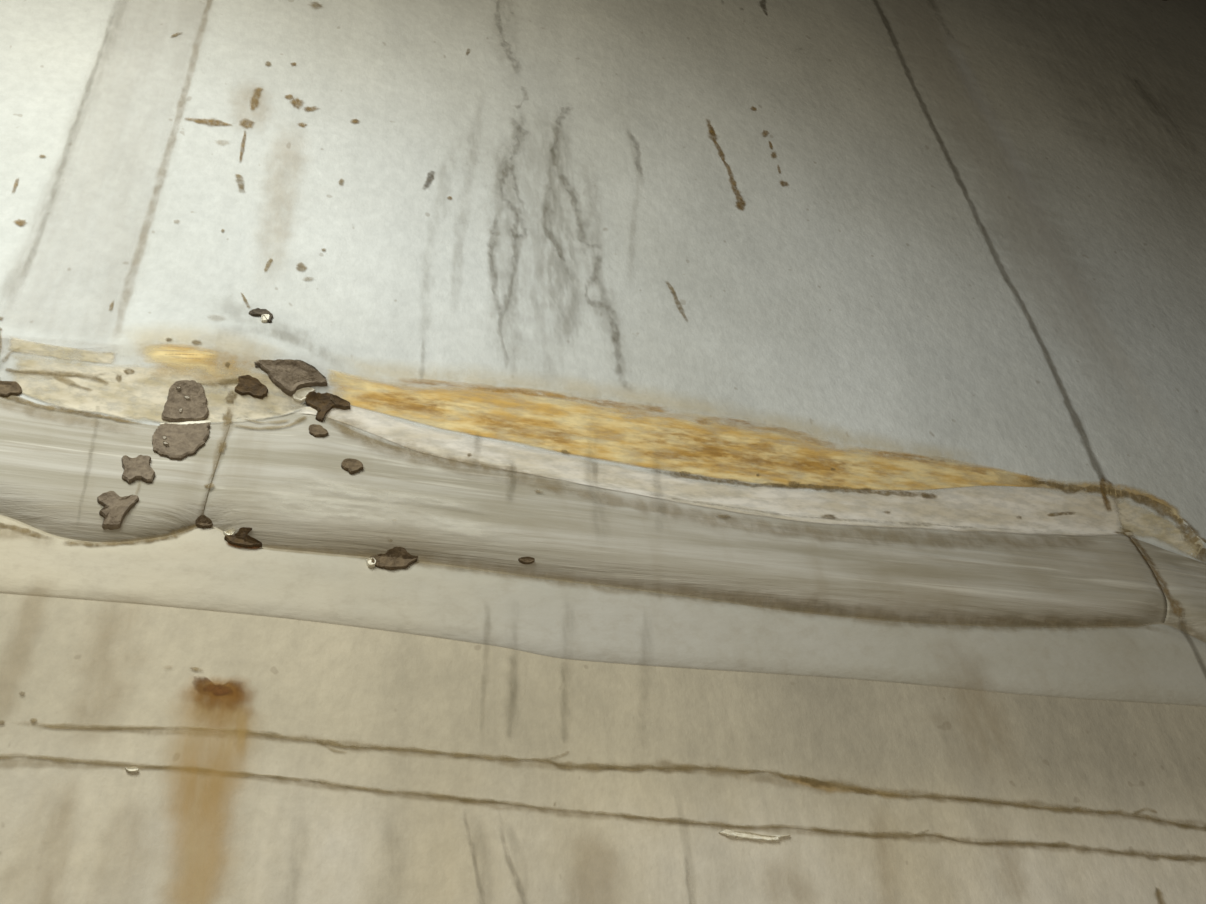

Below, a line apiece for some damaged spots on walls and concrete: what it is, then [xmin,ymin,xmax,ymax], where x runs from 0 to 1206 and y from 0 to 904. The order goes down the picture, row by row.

corrosion [285,95,318,127]
corrosion [188,88,262,160]
peeling [0,359,1206,706]
corrosion [191,667,242,713]
crack [429,751,540,761]
crack [579,763,687,771]
crack [601,813,691,823]
crack [719,826,823,842]
crack [854,831,885,839]